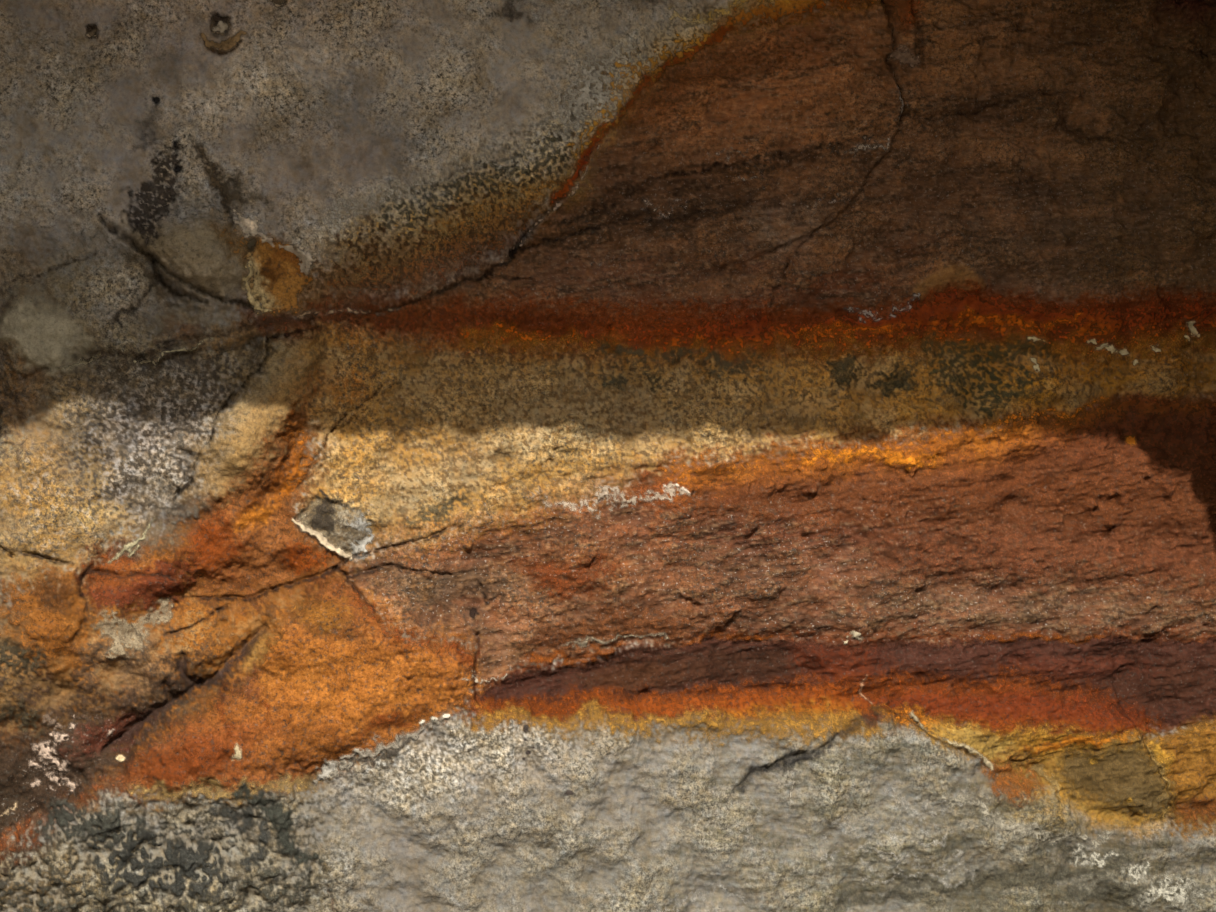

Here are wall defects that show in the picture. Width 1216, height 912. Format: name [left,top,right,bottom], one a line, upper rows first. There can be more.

corrosion [242,24,735,339]
crack [4,550,56,563]
spalling [292,489,374,560]
crack [76,570,174,634]
crack [108,524,462,746]
crack [472,638,480,698]
corrosion [0,393,1216,865]
crack [737,707,977,792]